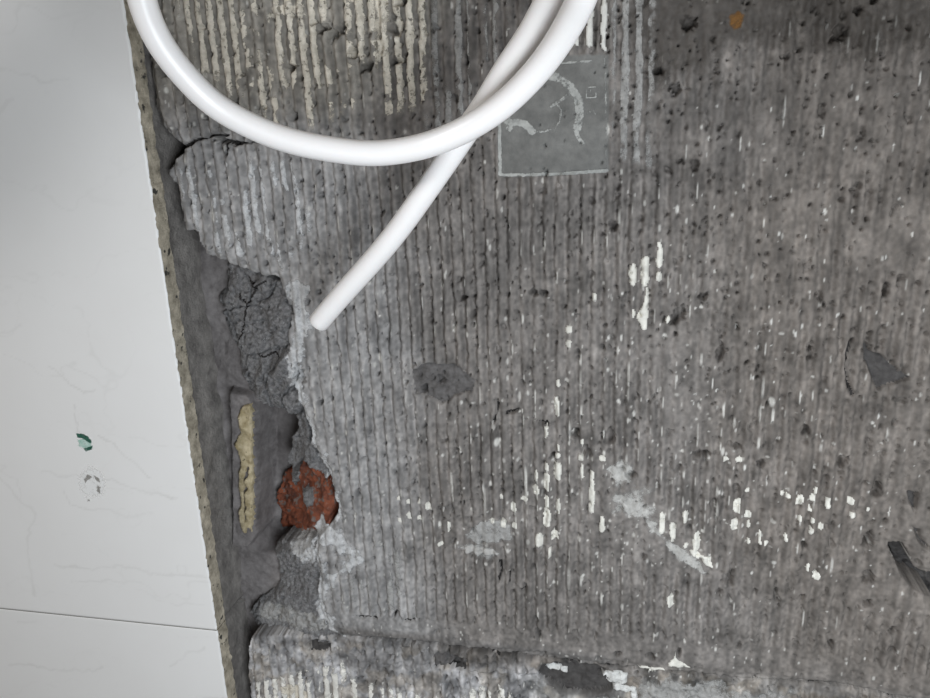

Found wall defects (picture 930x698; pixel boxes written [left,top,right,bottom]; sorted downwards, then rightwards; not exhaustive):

crack [186,134,254,154]
spalling [220,262,339,650]
spalling [888,541,930,592]
spalling [433,651,467,669]
spalling [538,660,638,698]
peeling [638,652,690,672]